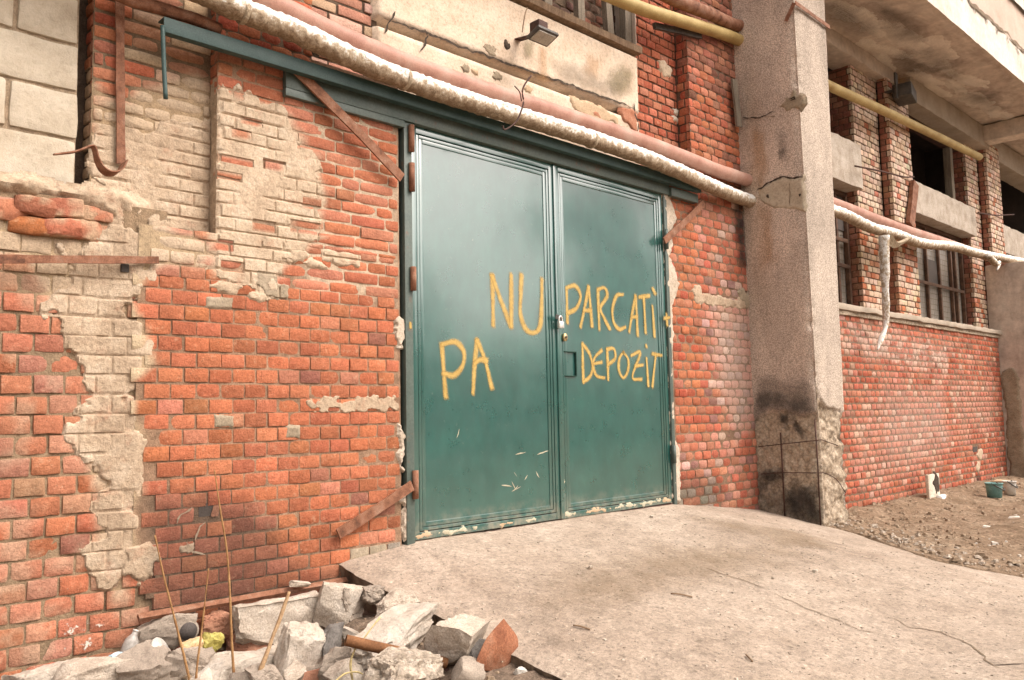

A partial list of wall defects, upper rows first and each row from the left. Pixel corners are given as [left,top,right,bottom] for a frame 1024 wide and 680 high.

spalling [779,90,808,112]
crack [758,175,803,204]
flaking render [661,195,680,388]
spalling [0,83,329,592]
leakage [757,395,814,413]
flaking render [565,441,681,517]
spalling [755,385,849,527]
peeling [416,525,477,539]
crack [708,568,1024,667]